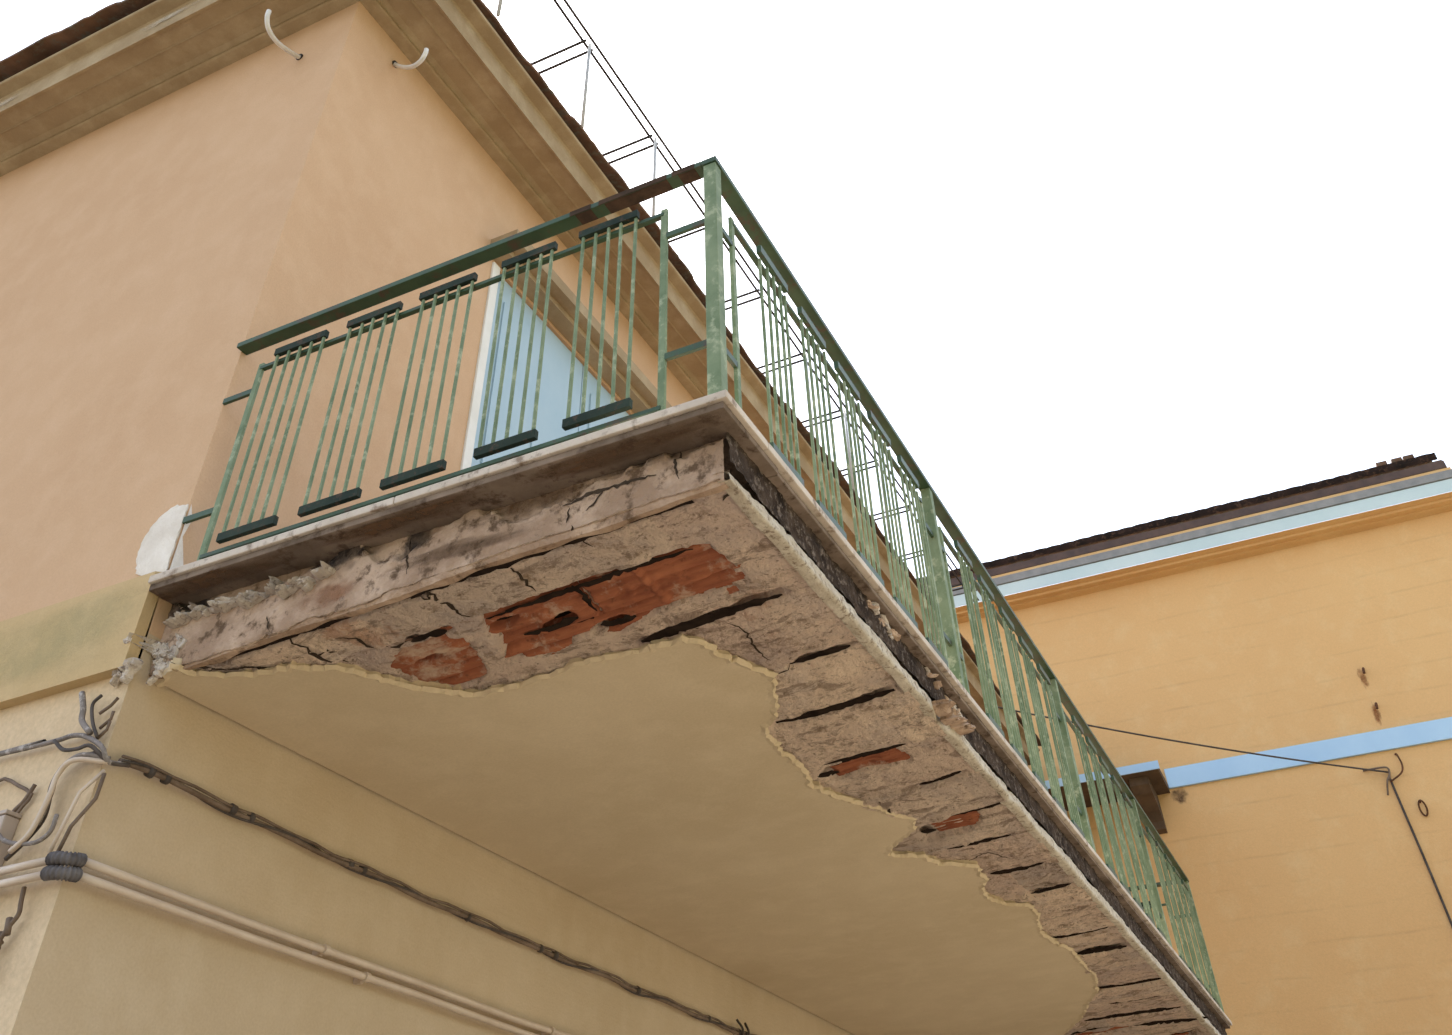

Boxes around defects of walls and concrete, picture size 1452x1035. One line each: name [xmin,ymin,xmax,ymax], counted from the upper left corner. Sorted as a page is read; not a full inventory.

crack [563,452,682,547]
crack [406,540,471,617]
crack [510,568,536,591]
crack [171,617,410,672]
crack [728,623,790,674]
spalling [109,478,1211,1035]